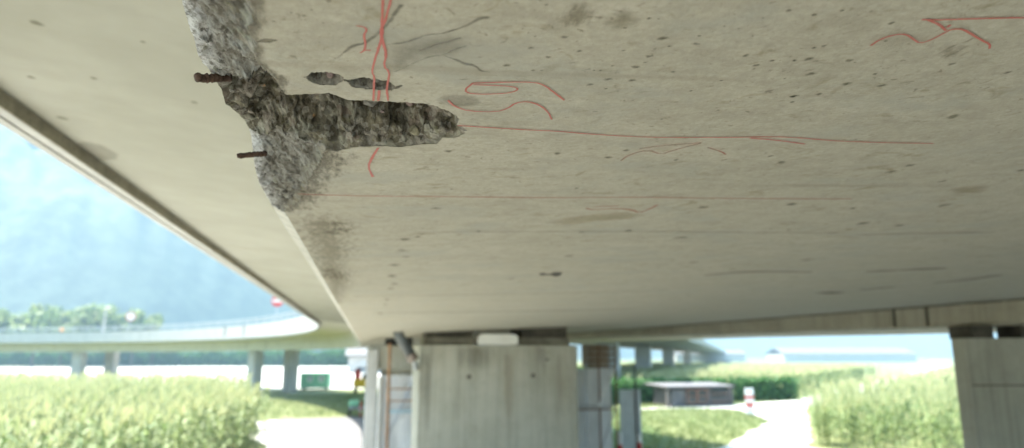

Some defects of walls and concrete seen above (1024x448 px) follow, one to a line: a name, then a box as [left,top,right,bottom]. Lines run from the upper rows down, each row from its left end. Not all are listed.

spalling [182,0,467,212]